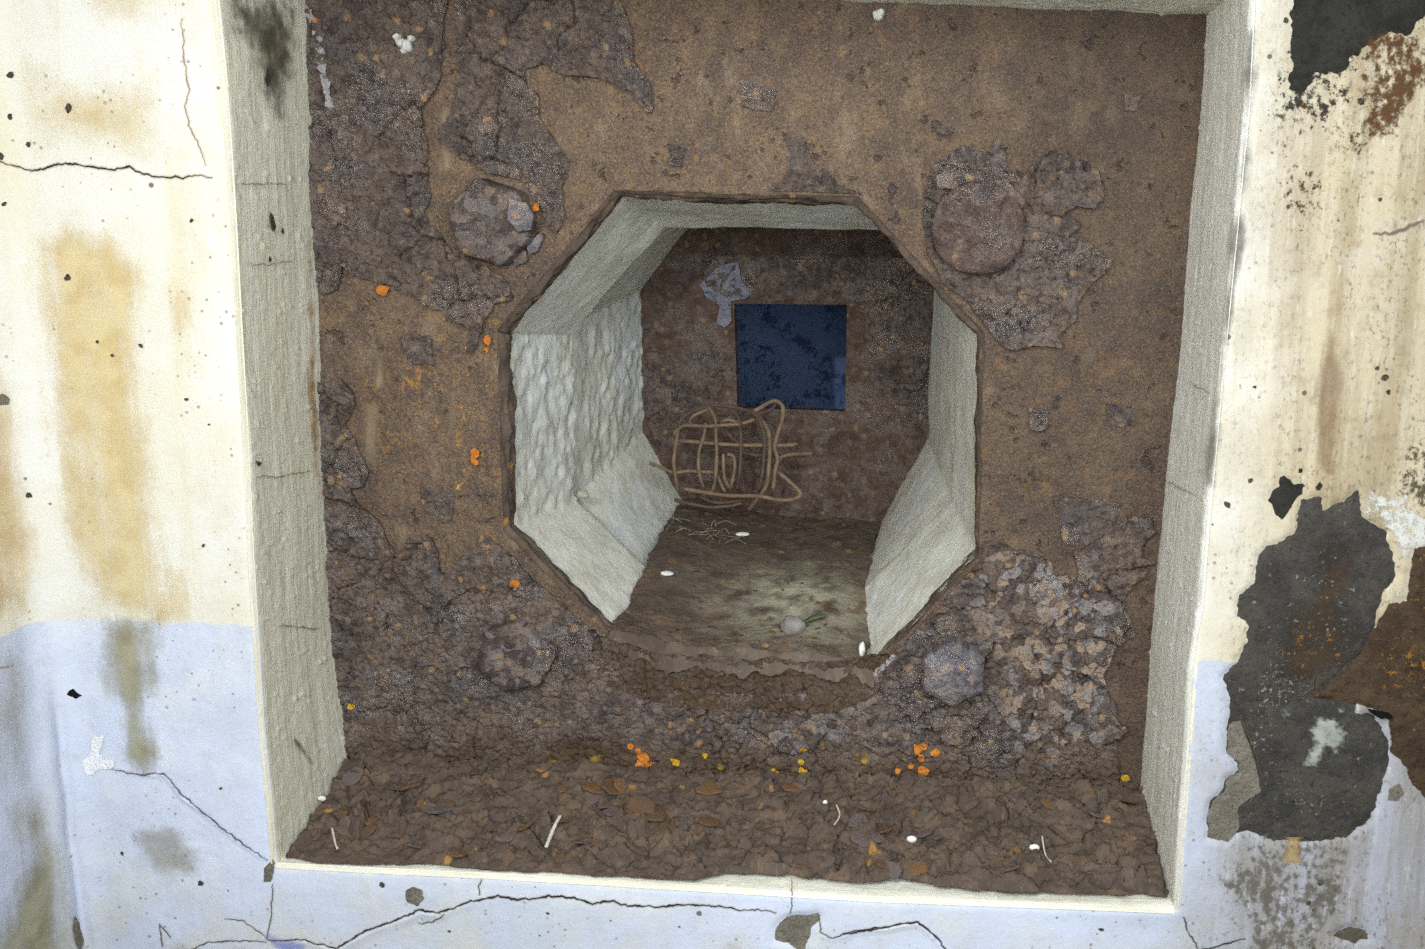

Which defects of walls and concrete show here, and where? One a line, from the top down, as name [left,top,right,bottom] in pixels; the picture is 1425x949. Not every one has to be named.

crack [0,20,286,185]
peeling [1266,0,1425,122]
rust [1271,32,1425,155]
rust [1275,155,1322,231]
water stain [56,241,145,605]
water stain [111,625,155,766]
peeling [1206,468,1404,949]
rust [1312,547,1425,797]
crack [112,769,946,949]
crack [1184,918,1243,949]